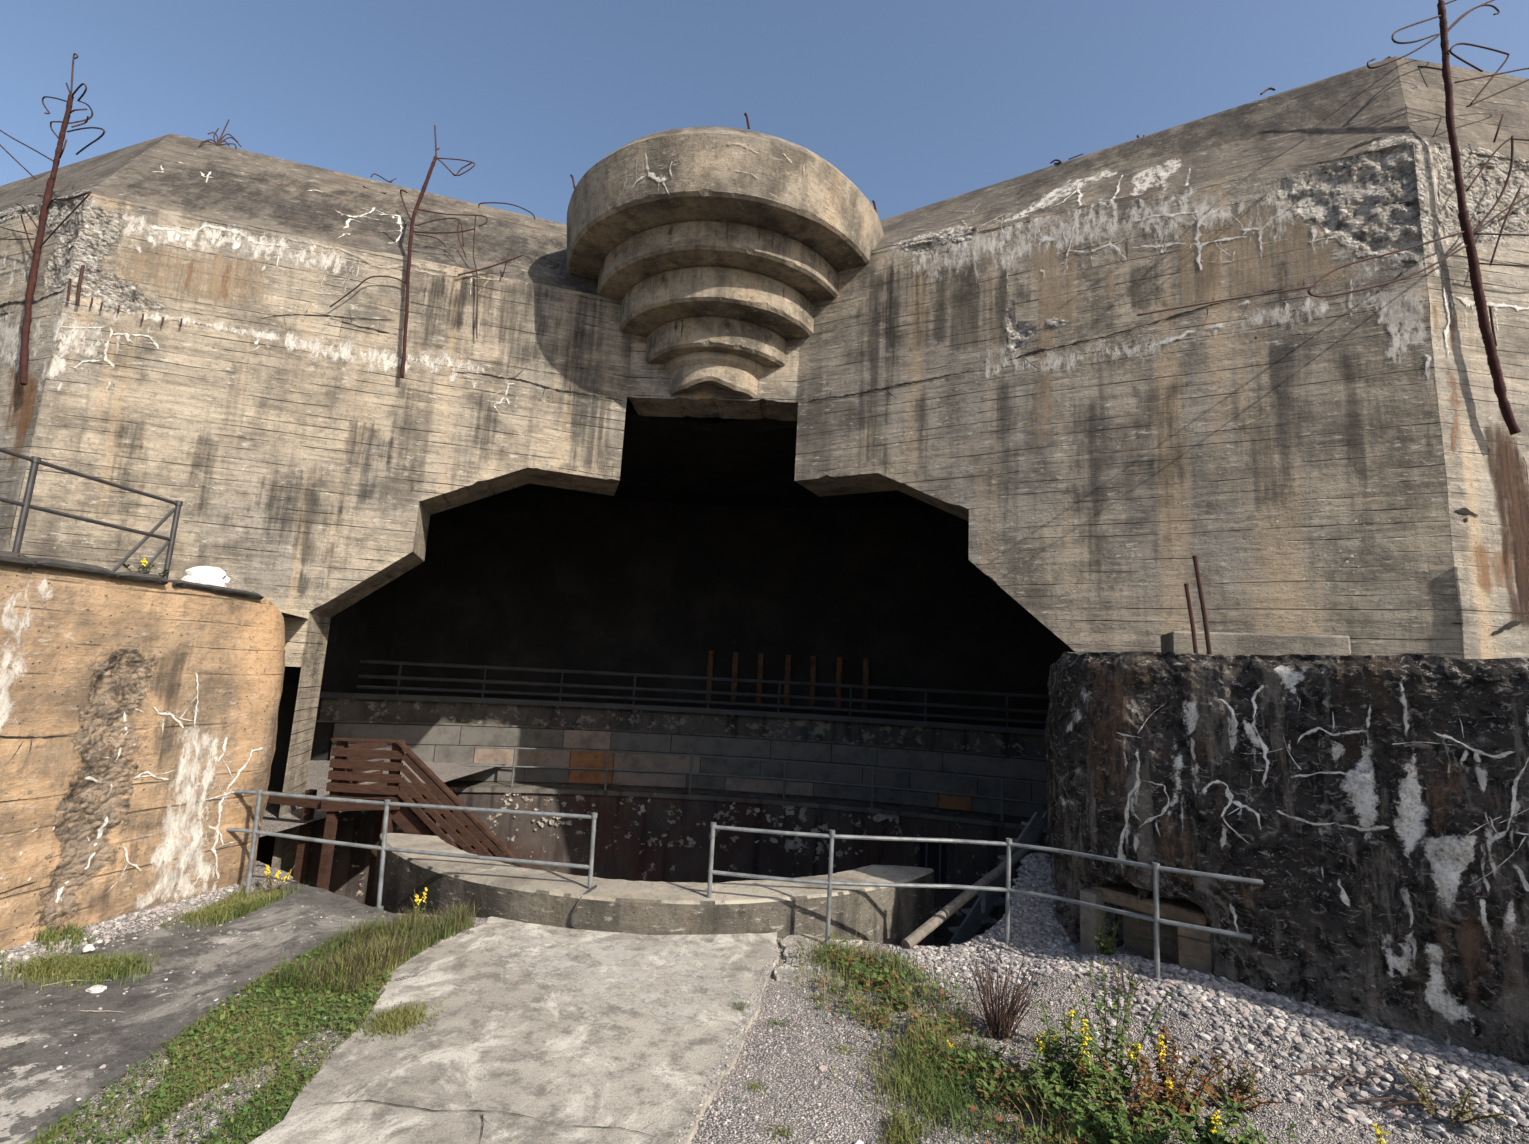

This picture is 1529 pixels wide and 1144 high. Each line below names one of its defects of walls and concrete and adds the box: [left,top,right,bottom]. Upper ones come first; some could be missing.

corrosion [0,53,105,463]
spalling [0,187,485,388]
crack [803,205,1317,403]
damp [913,159,1529,433]
corrosion [1137,0,1529,625]
spalling [1268,135,1529,284]
spalling [28,644,158,931]
damp [137,728,218,909]
peeling [504,792,596,831]
damp [1217,665,1305,787]
damp [1331,683,1516,944]
damp [1382,889,1475,1047]